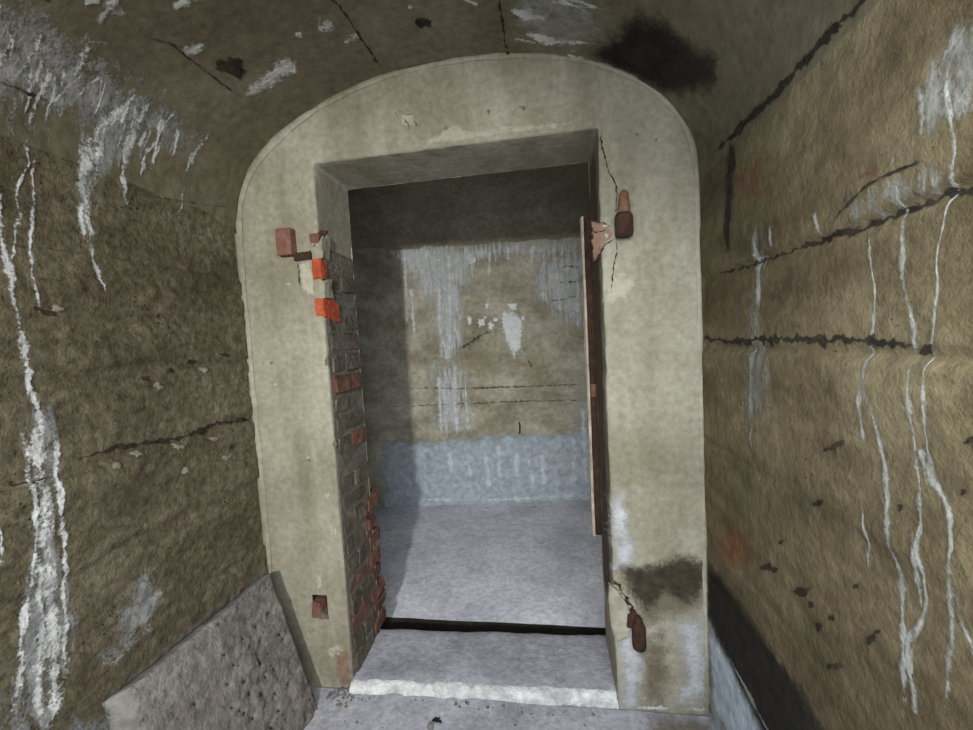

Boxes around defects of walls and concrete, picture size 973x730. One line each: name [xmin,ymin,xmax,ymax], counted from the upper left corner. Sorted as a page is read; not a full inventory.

hole [215,57,247,79]
crack [332,0,380,65]
crack [732,0,865,138]
damp [0,148,78,730]
damp [0,5,209,291]
flaking render [286,262,314,295]
damp [380,239,591,510]
crack [600,133,618,203]
crack [704,333,933,356]
crack [720,160,973,274]
efflorescence [852,28,973,714]
damp [612,499,824,730]